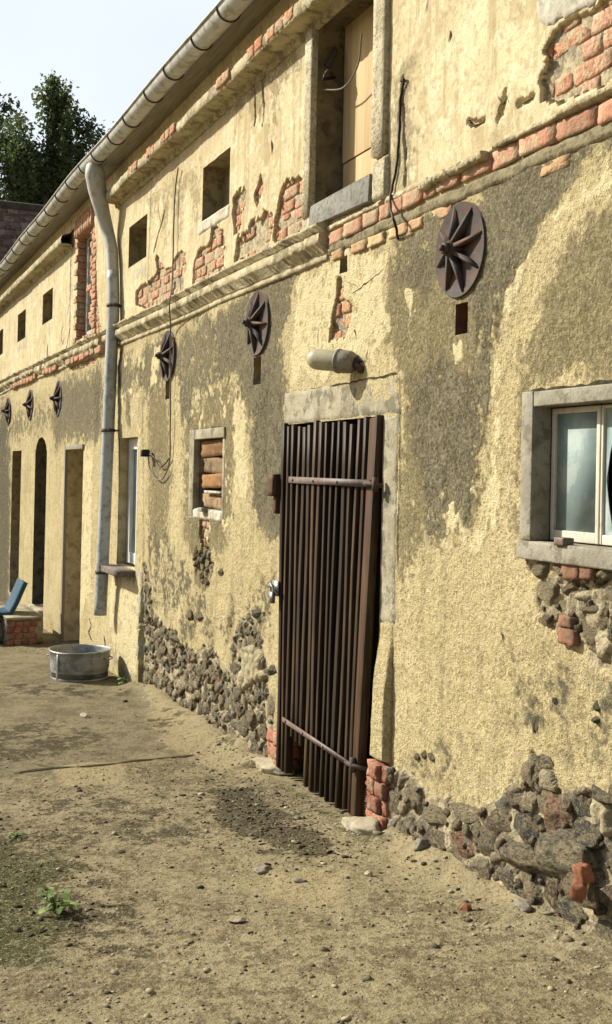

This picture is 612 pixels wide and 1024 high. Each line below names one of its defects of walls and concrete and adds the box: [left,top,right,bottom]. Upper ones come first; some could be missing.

spalling [540,0,612,98]
spalling [82,227,101,338]
spalling [138,176,303,308]
spalling [328,281,353,339]